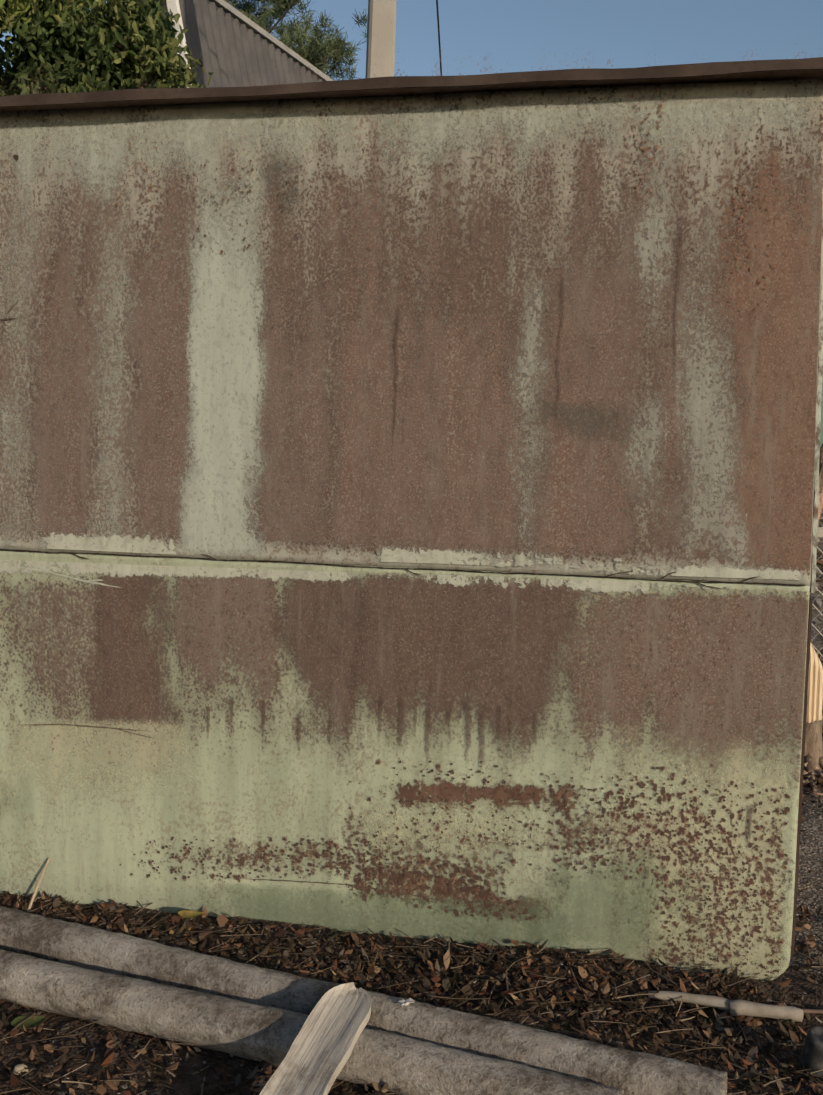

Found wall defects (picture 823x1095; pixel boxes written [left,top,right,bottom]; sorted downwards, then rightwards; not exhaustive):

rust [0,87,823,575]
rust [0,572,809,798]
rust [174,779,792,979]